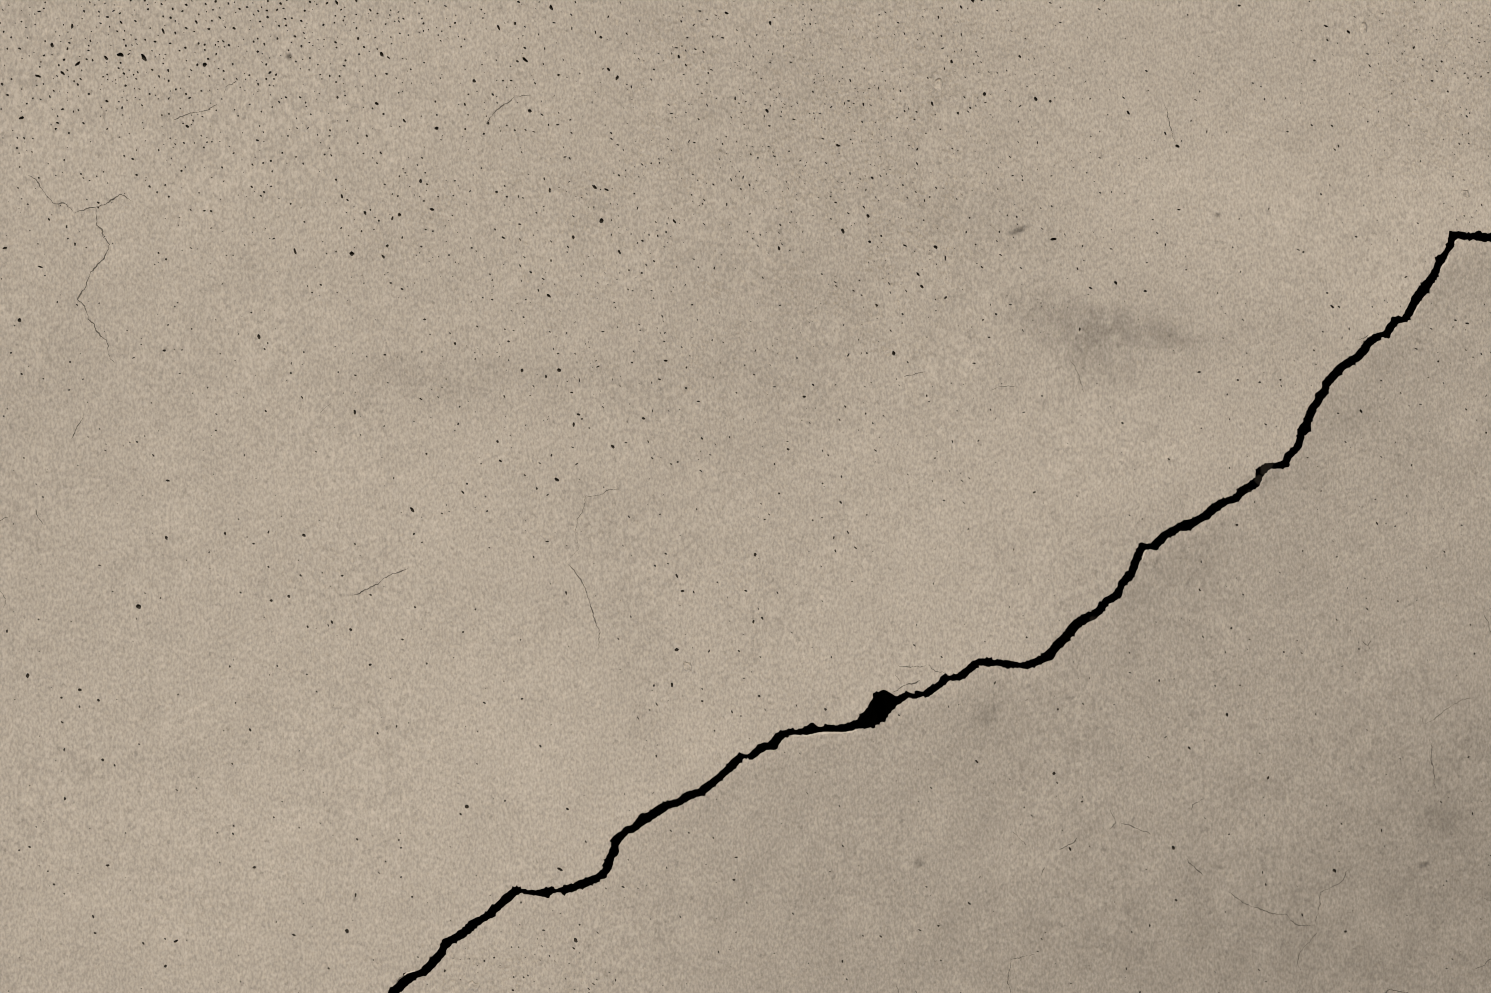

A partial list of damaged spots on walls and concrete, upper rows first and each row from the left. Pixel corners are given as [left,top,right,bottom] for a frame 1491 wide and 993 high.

crack [355,568,408,595]
crack [388,231,1491,993]